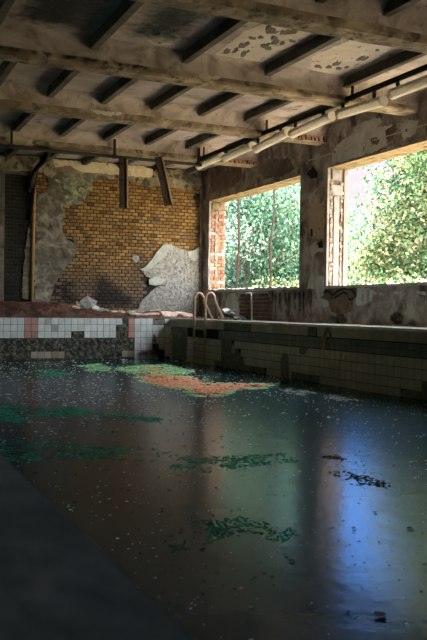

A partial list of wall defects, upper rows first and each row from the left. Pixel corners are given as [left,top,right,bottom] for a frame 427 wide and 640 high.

peeling [216,24,310,61]
peeling [307,40,394,75]
peeling [332,117,419,164]
spalling [0,173,200,361]
spalling [307,182,383,316]